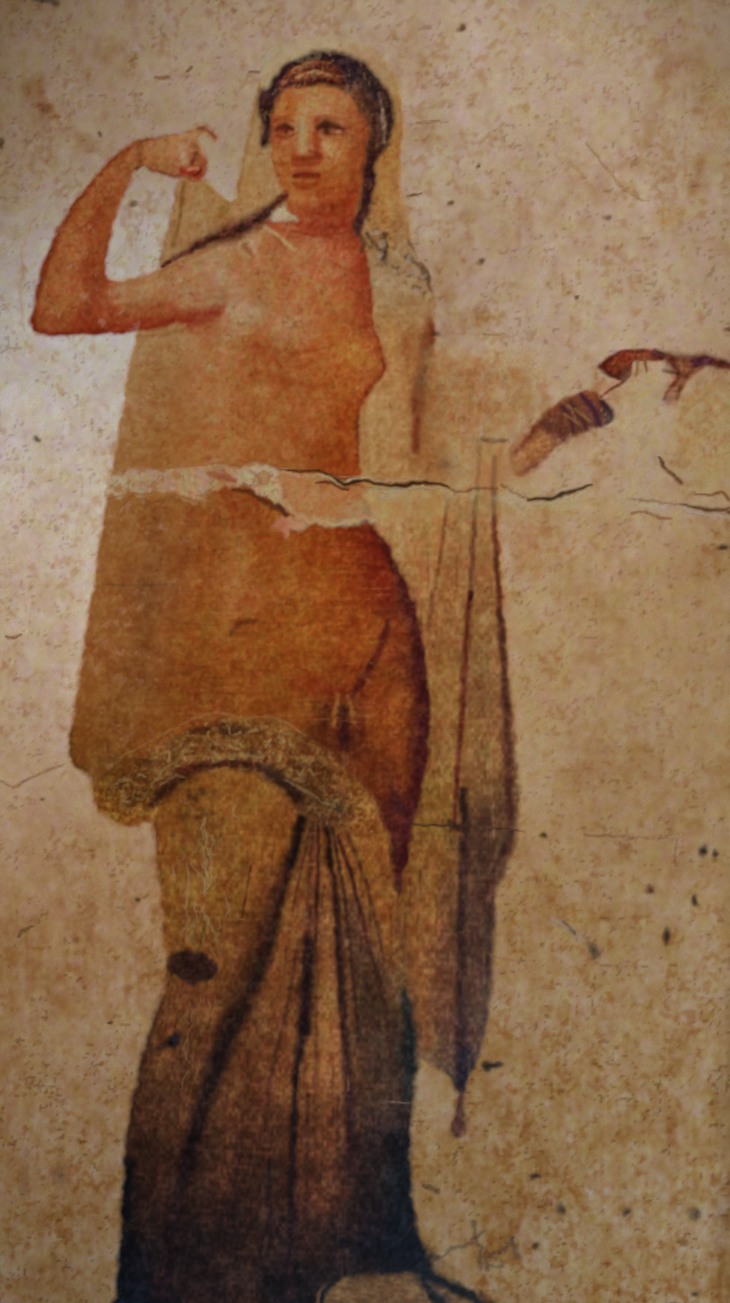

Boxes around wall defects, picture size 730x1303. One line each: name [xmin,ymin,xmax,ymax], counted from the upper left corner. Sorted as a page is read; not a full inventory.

flaking render [106,461,375,536]
crack [280,469,450,490]
crack [528,484,592,501]
crack [631,457,730,519]